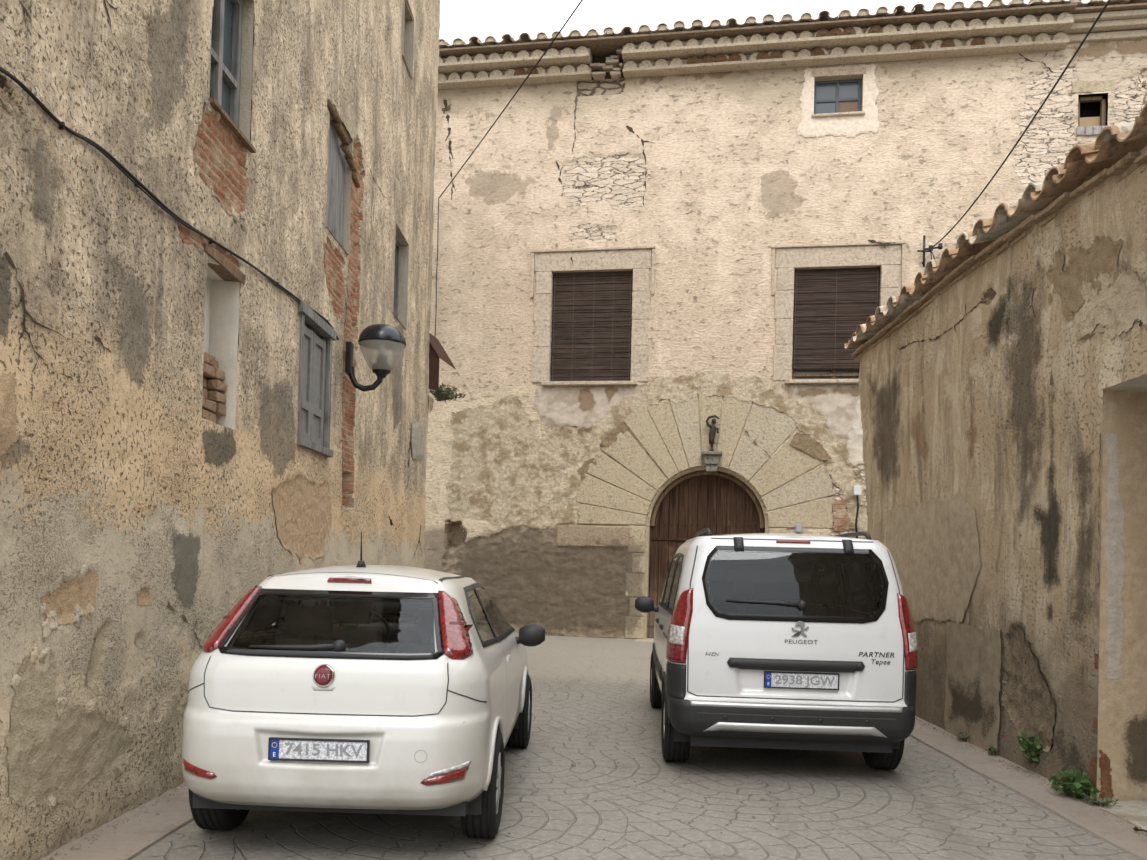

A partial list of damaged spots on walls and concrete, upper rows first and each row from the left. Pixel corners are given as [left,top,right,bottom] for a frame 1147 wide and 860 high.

spalling [193,98,249,231]
crack [556,96,652,206]
spalling [560,152,650,208]
flaking render [272,133,365,565]
crack [899,294,996,350]
flaking render [1046,236,1147,339]
water stain [797,378,899,483]
water stain [986,279,1061,586]
water stain [1071,454,1092,624]
flaking render [5,565,131,815]
water stain [1125,716,1147,783]